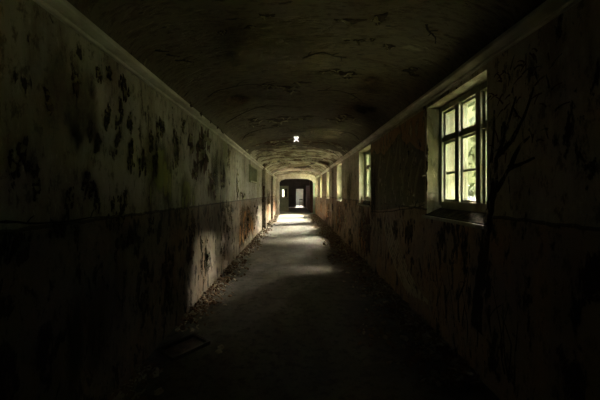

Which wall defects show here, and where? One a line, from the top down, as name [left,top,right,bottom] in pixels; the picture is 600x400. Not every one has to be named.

spalling [94,73,231,201]
peeling [185,206,211,287]